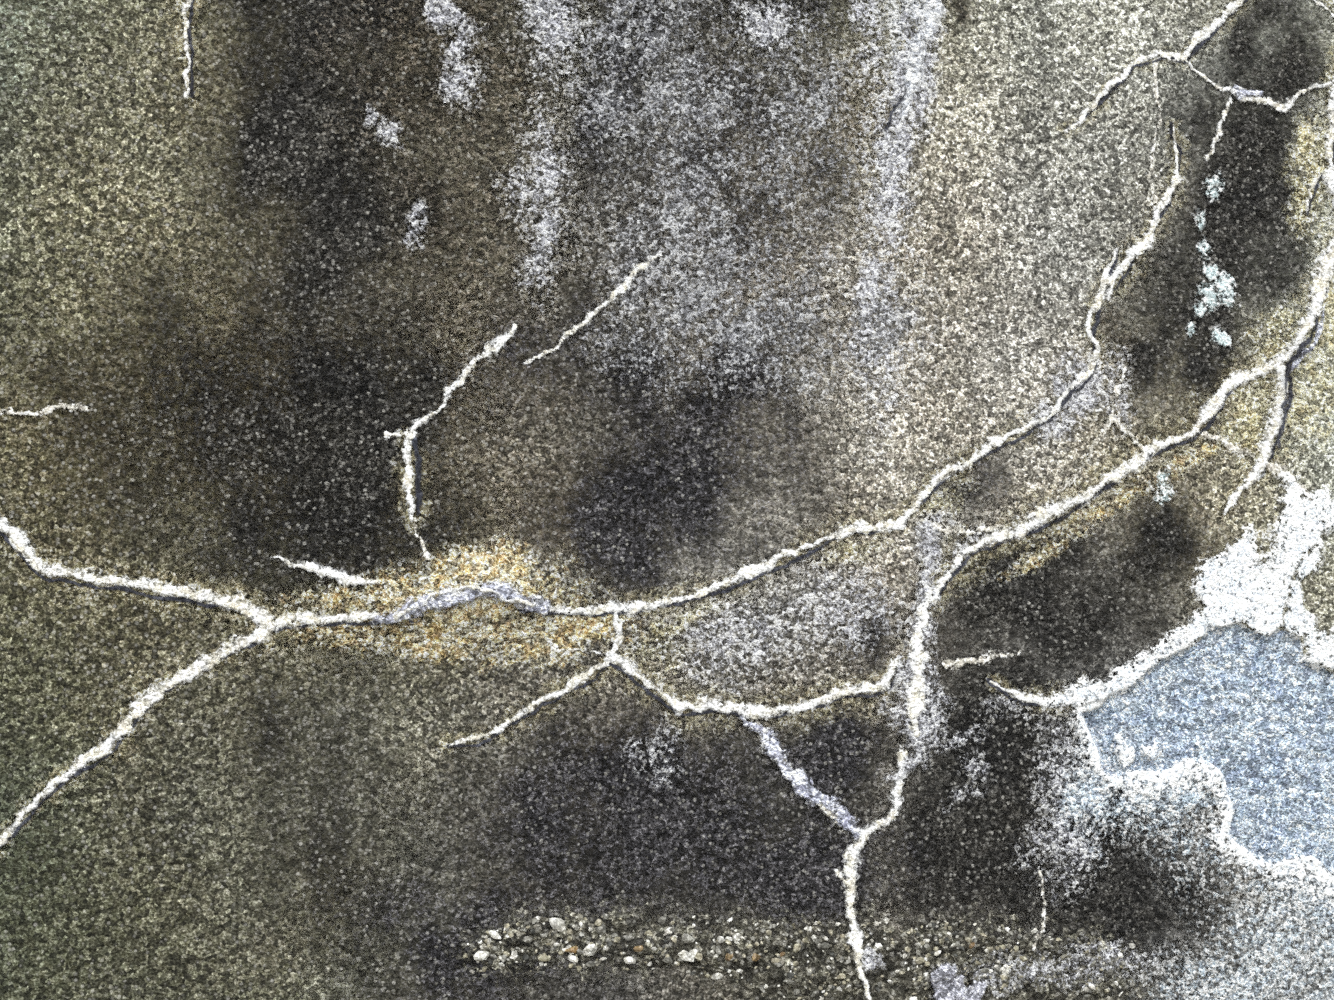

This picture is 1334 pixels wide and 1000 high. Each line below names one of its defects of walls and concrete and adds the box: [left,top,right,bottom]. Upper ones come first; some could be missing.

crack [181,0,195,98]
water stain [19,0,946,615]
crack [0,113,1334,848]
crack [884,10,928,131]
water stain [1024,0,1333,445]
peeling [1032,471,1334,910]
crack [1064,0,1334,215]
crack [1032,870,1047,951]